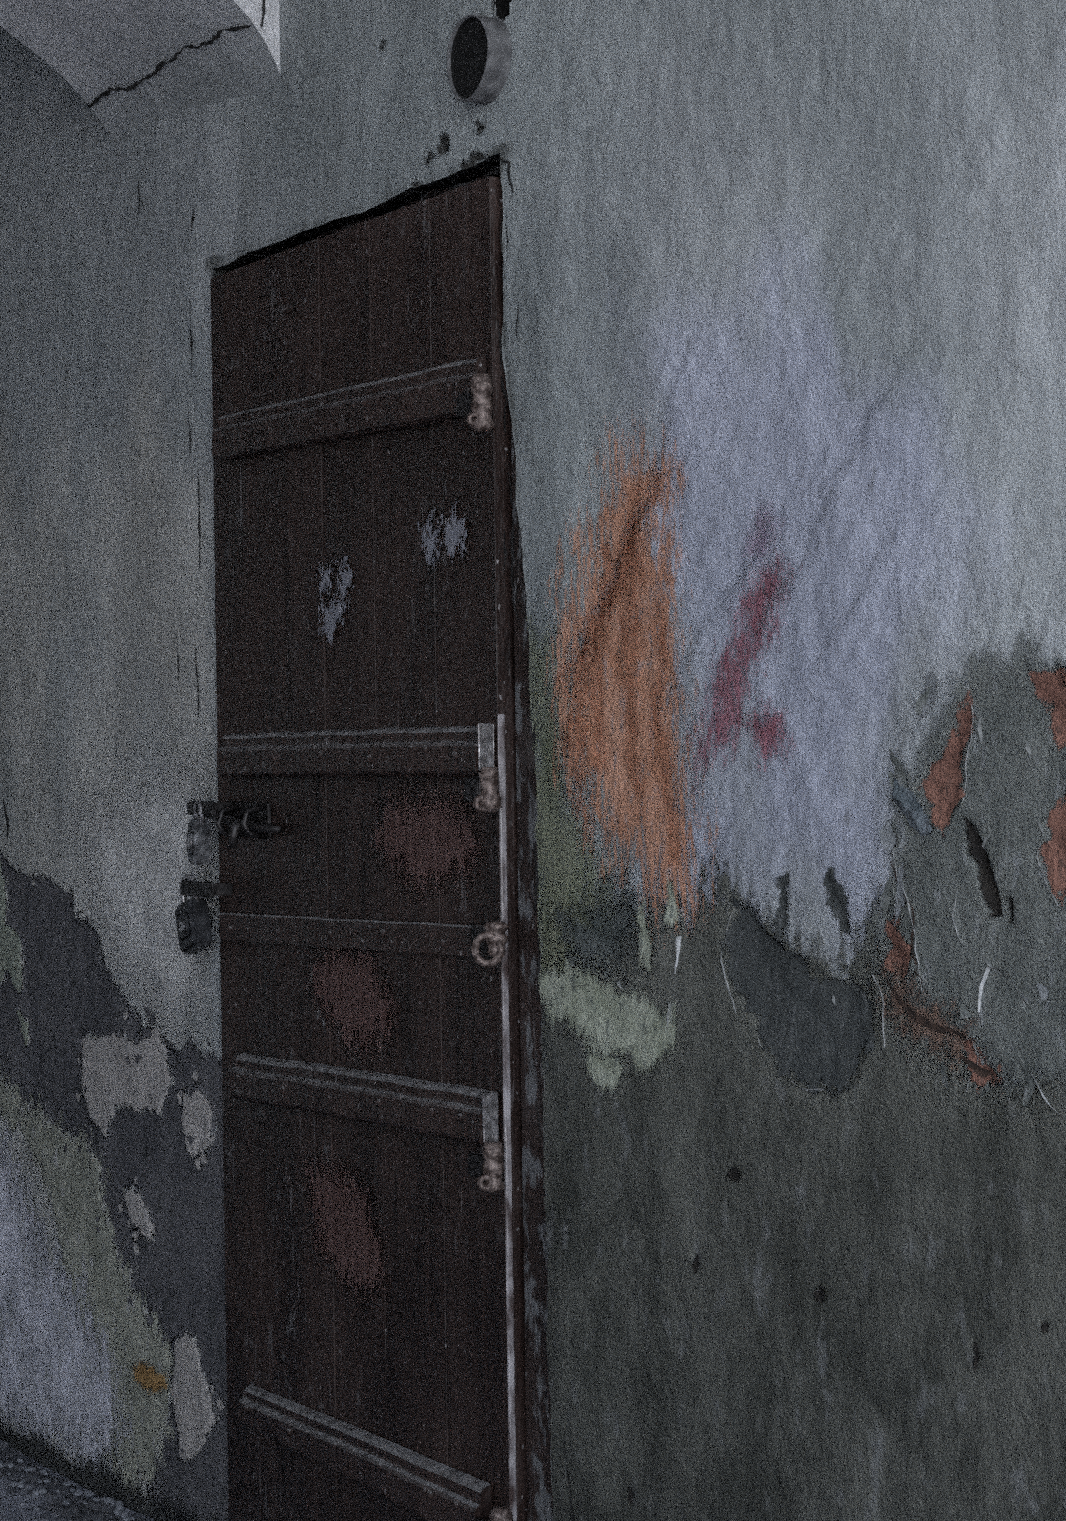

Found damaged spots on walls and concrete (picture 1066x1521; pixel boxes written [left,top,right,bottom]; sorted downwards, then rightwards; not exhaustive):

crack [87,0,265,108]
peeling [0,851,229,1521]
peeling [538,635,1066,1521]